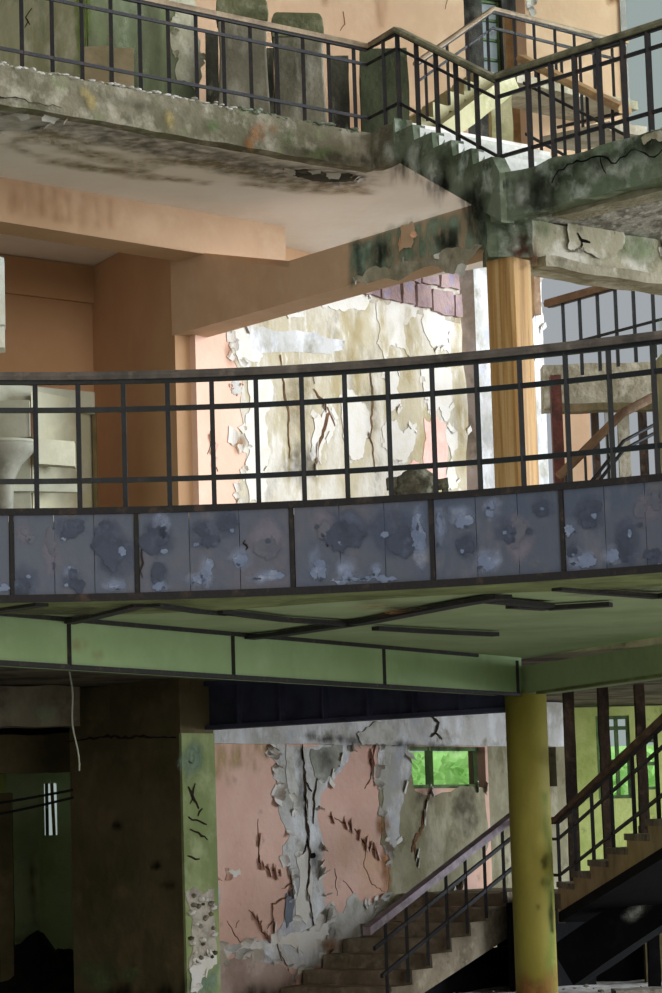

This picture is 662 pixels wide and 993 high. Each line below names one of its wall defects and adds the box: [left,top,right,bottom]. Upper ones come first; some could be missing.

flaking render [0,0,359,135]
water stain [18,120,365,193]
spalling [283,168,365,186]
crack [551,149,662,183]
peeling [567,223,625,259]
flaking render [226,221,483,368]
flaking render [192,366,472,585]
peeling [455,509,500,572]
crack [65,734,176,742]
crack [188,761,208,860]
crack [227,744,385,971]
flaking render [185,721,488,993]